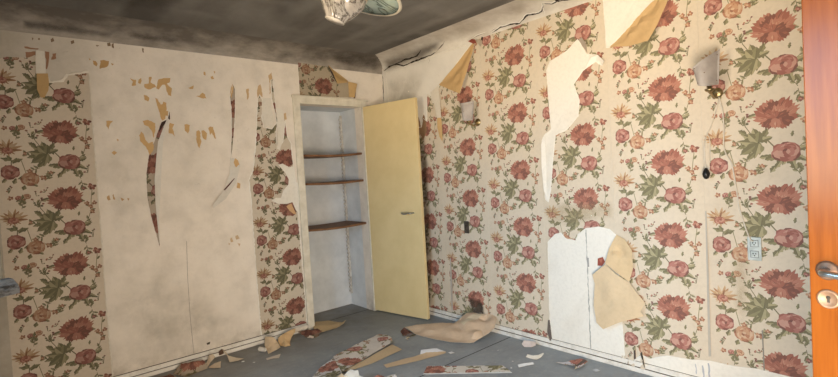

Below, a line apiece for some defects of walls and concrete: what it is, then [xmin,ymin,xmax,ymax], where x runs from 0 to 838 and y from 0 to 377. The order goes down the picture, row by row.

crack [470,0,568,40]
peeling [603,0,668,48]
peeling [130,77,175,154]
peeling [184,124,216,148]
peeling [246,73,272,99]
crack [382,43,444,102]
flaking render [386,43,471,140]
peeling [541,37,604,202]
peeling [547,227,645,358]
peeling [634,355,788,377]